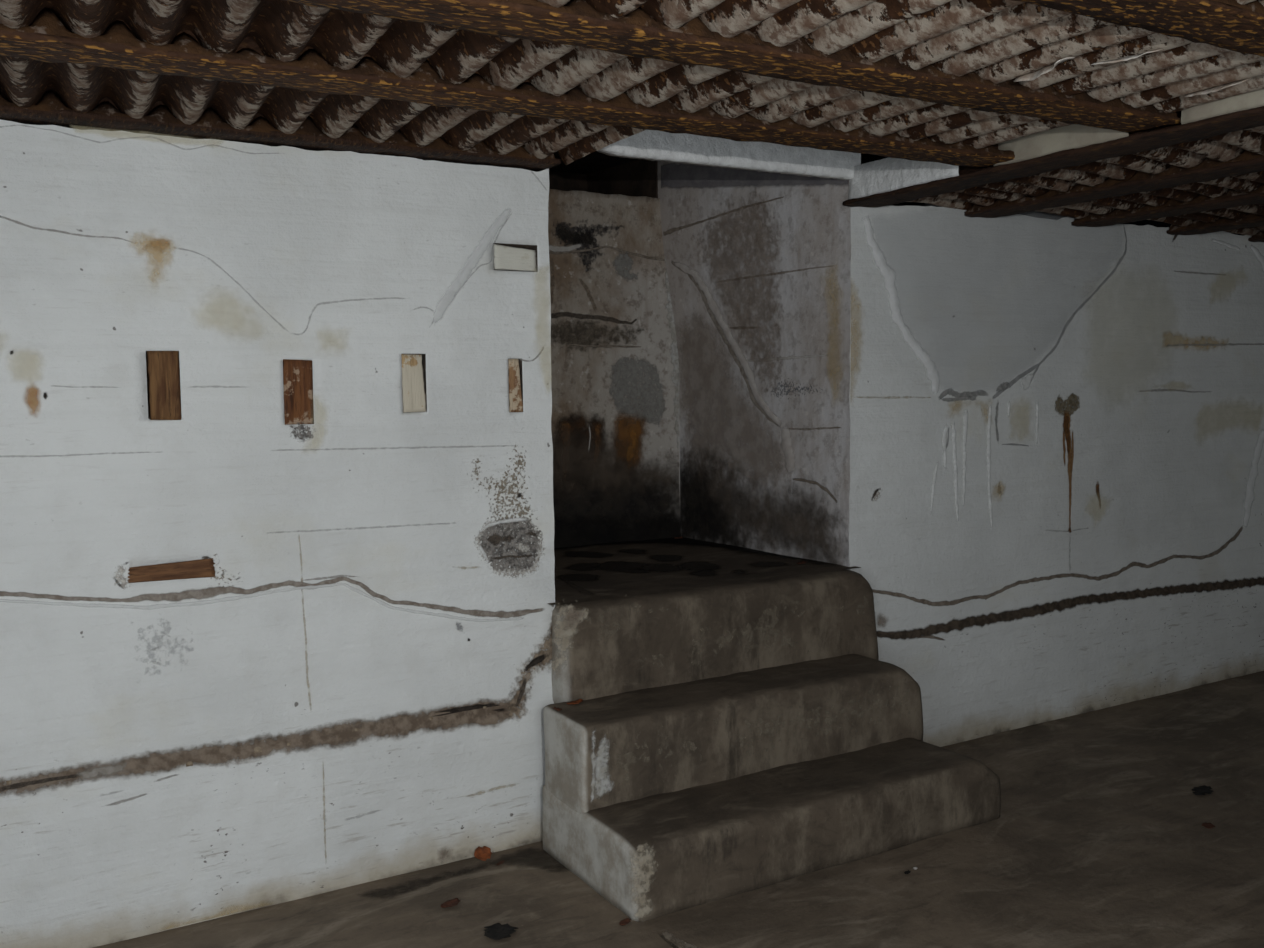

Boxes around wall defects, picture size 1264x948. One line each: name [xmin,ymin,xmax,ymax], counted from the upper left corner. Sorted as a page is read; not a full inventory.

crack [0,216,122,239]
water stain [146,240,169,262]
water stain [553,221,624,310]
water stain [552,434,837,581]
rust [1055,393,1080,533]
crack [0,575,543,622]
crack [872,527,1264,640]
crack [0,700,514,794]